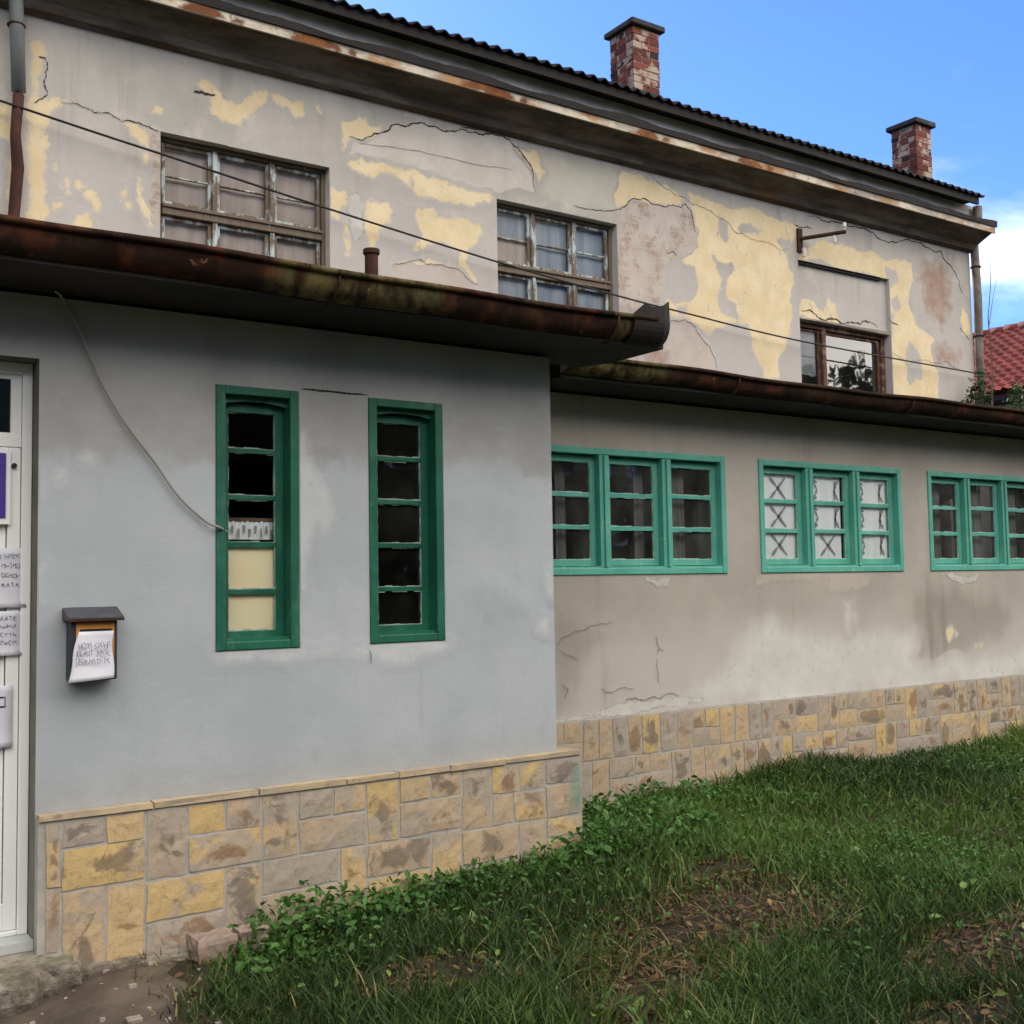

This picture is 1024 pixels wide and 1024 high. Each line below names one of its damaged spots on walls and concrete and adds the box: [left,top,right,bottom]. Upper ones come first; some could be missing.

corrosion [179,2,243,25]
corrosion [292,33,356,56]
corrosion [463,81,529,103]
crack [60,101,158,131]
peeling [0,28,163,236]
crack [350,122,536,191]
corrosion [738,157,773,171]
spalling [188,73,548,292]
crack [577,173,785,250]
peeling [612,166,973,399]
crack [801,309,898,326]
spalling [556,696,704,722]